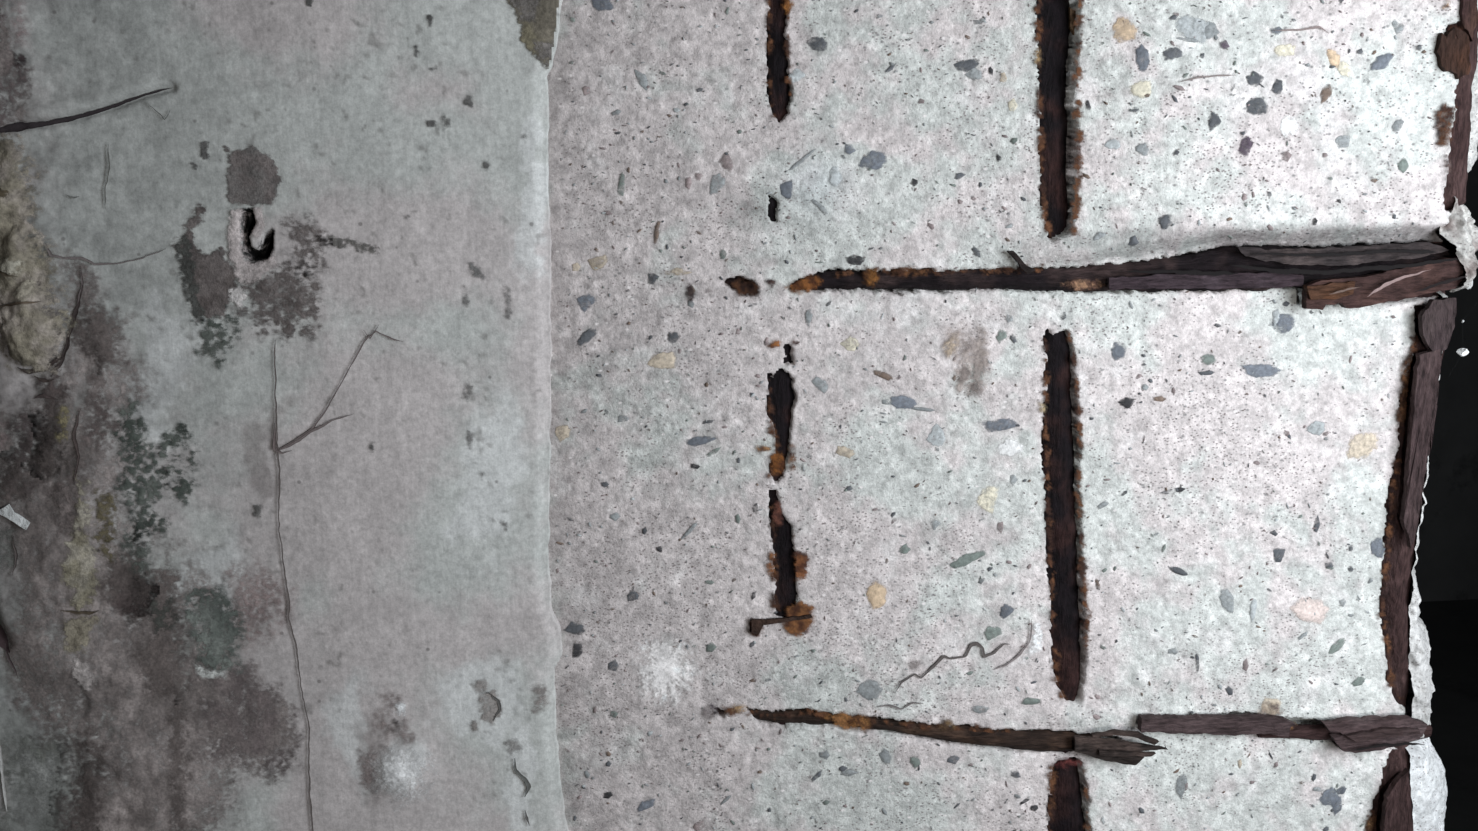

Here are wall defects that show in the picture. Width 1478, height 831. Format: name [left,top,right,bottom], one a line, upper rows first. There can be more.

crack [0,88,171,203]
peeling [463,263,484,305]
rust [731,251,1044,297]
spalling [508,0,1478,831]
water stain [0,263,302,831]
crack [273,328,403,831]
rust [749,502,815,637]
crack [878,619,1043,710]